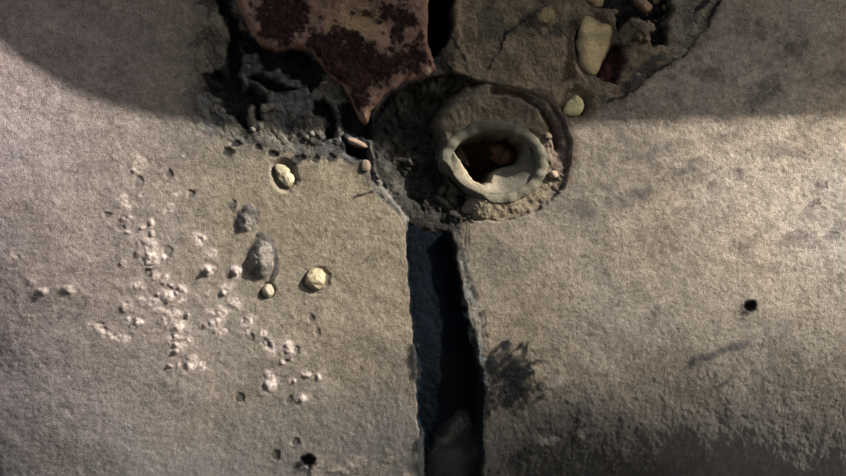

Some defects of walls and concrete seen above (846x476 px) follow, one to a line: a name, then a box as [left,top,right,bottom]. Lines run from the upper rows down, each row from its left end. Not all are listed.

rust [248,0,432,111]
spalling [189,0,720,188]
efflorescence [86,192,207,375]
efflorescence [192,231,217,277]
efflorescence [205,264,294,365]
efflorescence [261,370,323,393]
leakage [406,214,659,476]